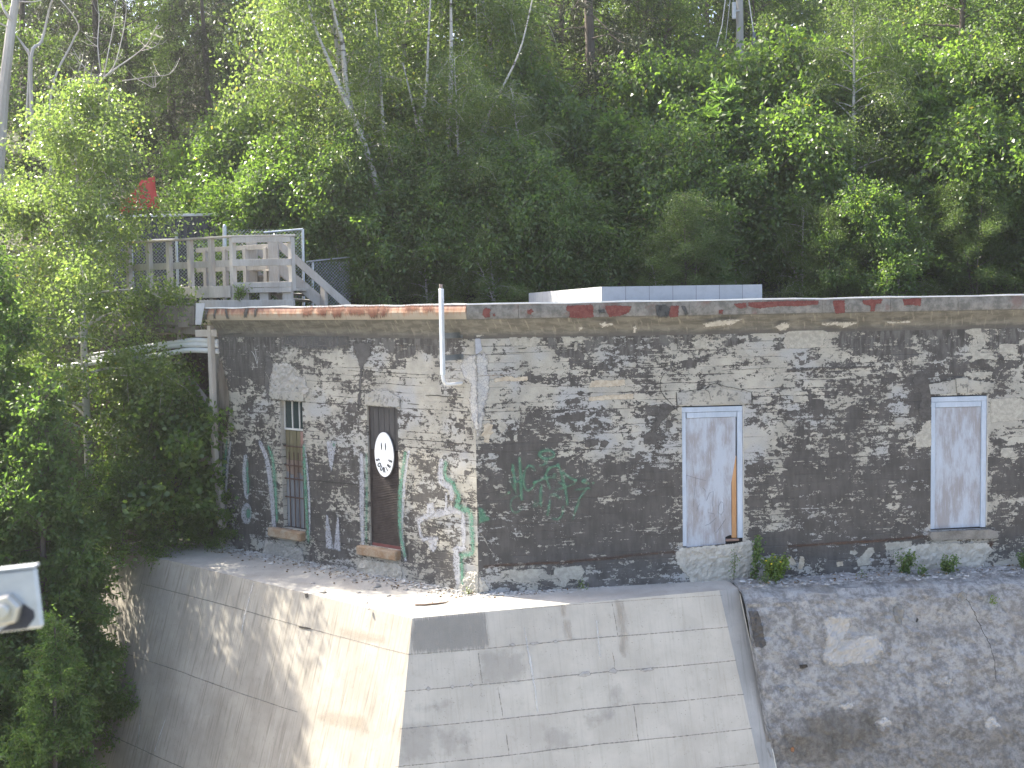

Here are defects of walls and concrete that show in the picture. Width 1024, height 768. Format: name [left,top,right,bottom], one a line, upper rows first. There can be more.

corrosion [301,305,389,318]
peeling [561,336,584,351]
peeling [783,330,829,349]
peeling [964,328,1021,377]
spalling [269,363,309,398]
spalling [460,335,528,443]
peeling [915,420,931,448]
peeling [1000,447,1018,458]
spalling [675,540,753,582]
spalling [836,541,994,570]
peeling [500,565,585,588]
crack [966,599,996,679]